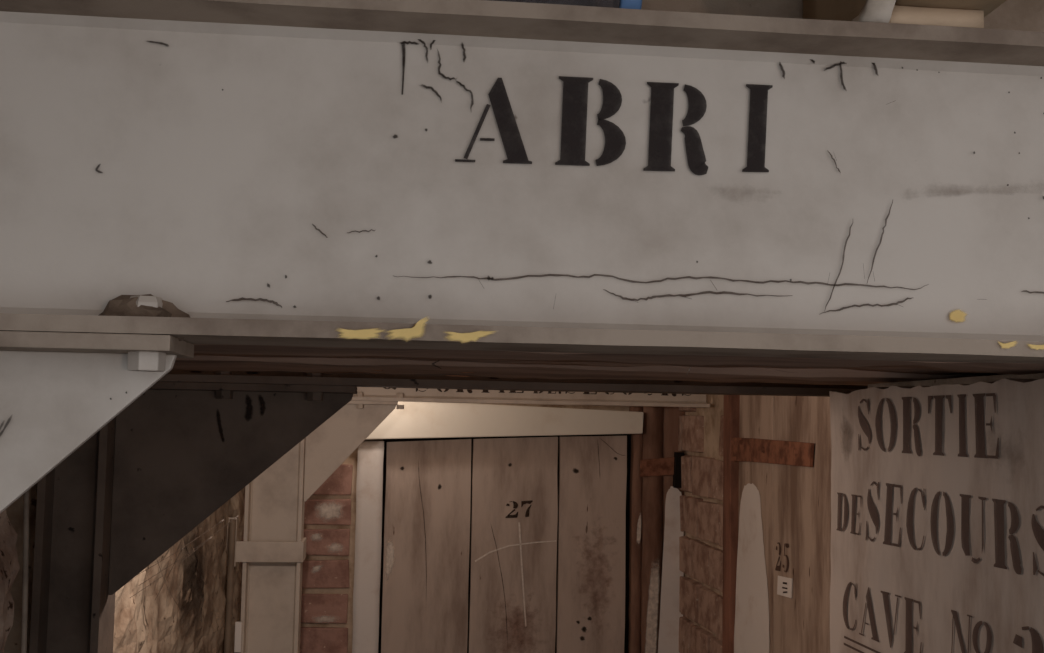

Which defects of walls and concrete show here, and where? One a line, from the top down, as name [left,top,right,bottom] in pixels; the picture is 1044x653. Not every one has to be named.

crack [395,201,929,315]